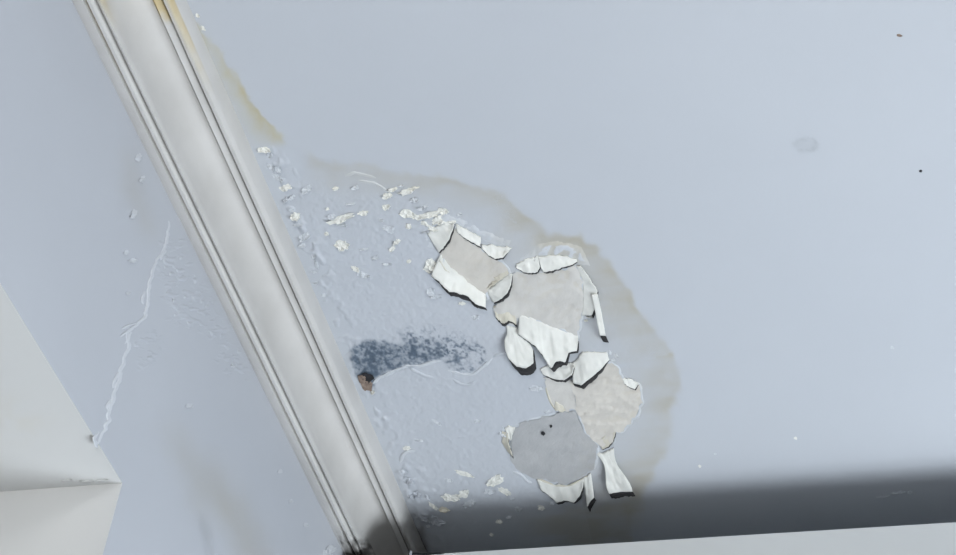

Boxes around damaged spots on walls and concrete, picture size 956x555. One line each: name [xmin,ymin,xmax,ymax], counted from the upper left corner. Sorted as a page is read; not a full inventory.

crack [92,221,170,448]
damp [355,345,507,395]
peeling [424,215,644,512]